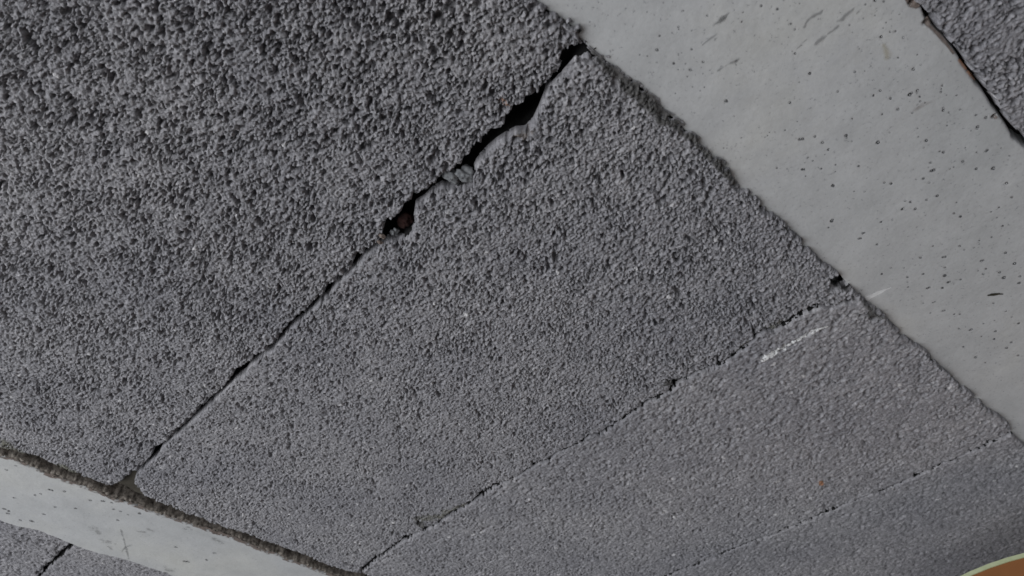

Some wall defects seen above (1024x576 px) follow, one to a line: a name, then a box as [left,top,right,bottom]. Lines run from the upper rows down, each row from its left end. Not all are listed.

crack [140,40,596,466]